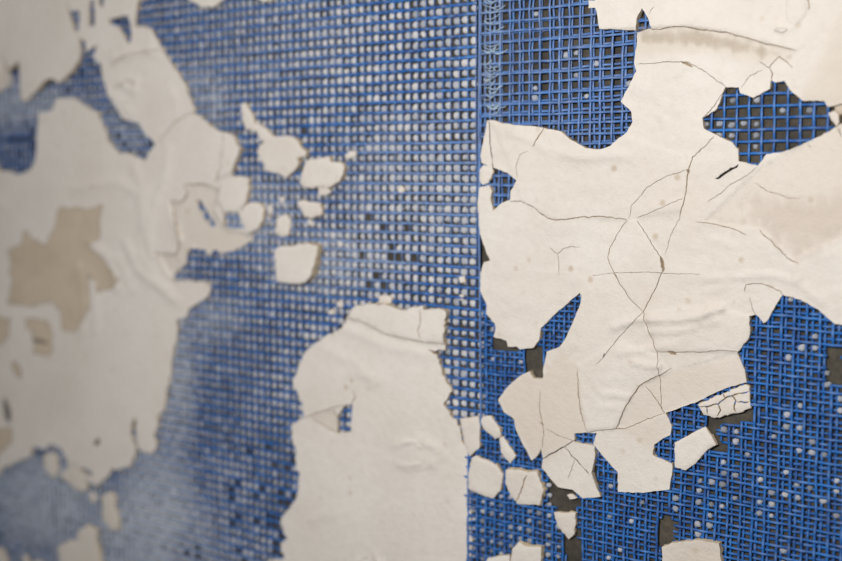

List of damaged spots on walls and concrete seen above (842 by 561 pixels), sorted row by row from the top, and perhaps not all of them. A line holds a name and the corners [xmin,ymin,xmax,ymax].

crack [640,7,796,117]
peeling [704,81,842,165]
peeling [0,0,651,561]
peeling [460,294,842,561]
crack [510,138,799,473]